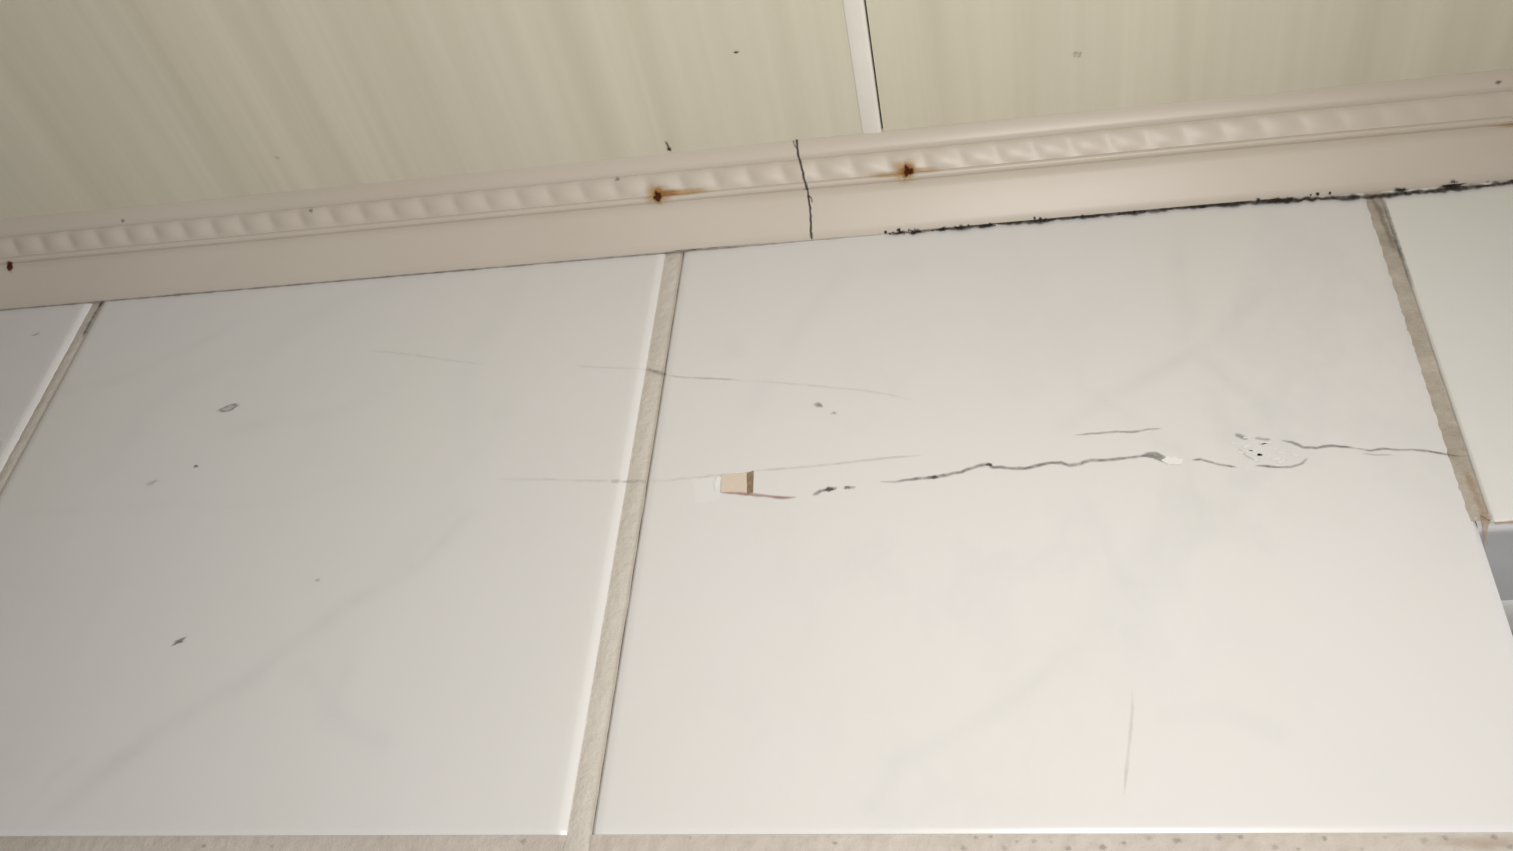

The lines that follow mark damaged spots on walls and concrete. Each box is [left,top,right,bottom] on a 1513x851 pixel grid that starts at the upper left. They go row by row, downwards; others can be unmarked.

rust [899,164,913,176]
rust [652,189,694,201]
water stain [884,180,1513,235]
crack [1155,456,1184,464]
crack [1231,436,1301,467]
spalling [691,471,788,505]